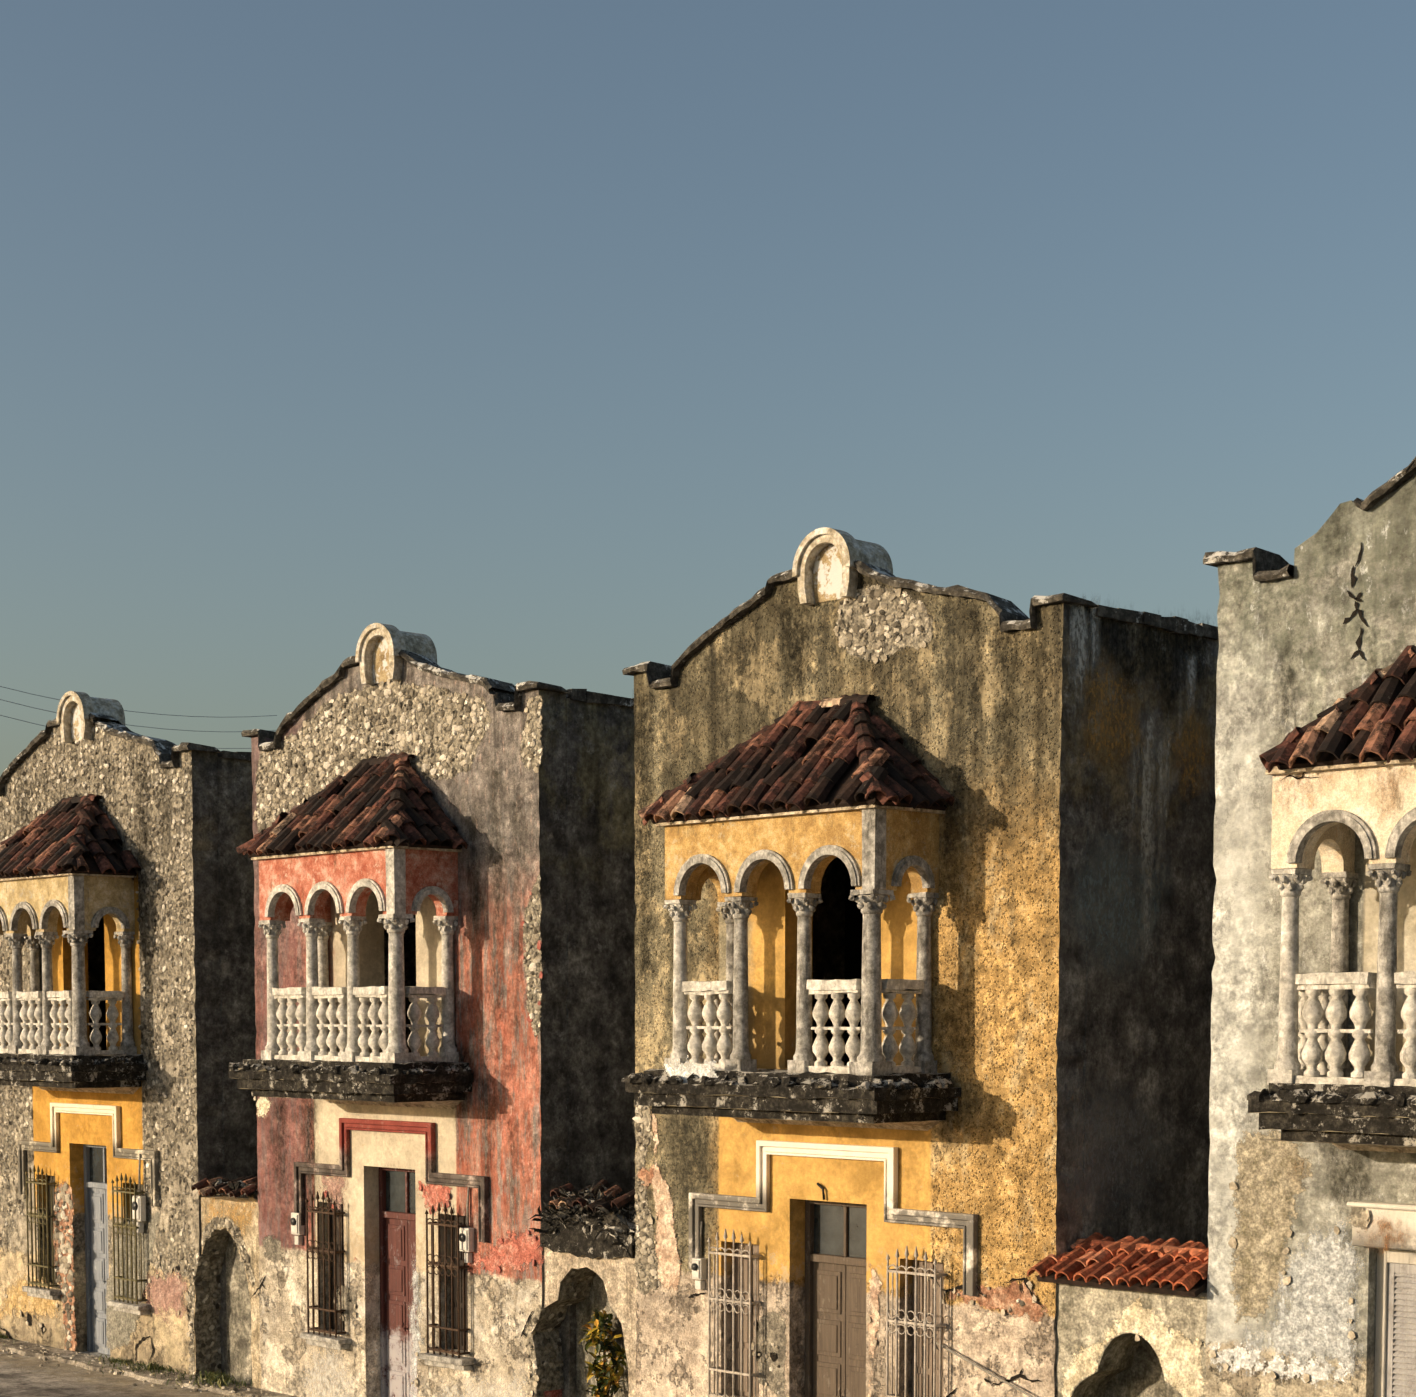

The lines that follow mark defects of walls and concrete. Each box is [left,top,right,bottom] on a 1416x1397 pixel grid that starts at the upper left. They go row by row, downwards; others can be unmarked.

flaking render [833,584,933,664]
crack [1343,542,1368,661]
damp [1070,597,1208,967]
flaking render [521,872,543,1036]
flaking render [0,1180,77,1352]
peeling [466,1225,543,1276]
flaking render [632,1100,682,1294]
flaking render [1059,1129,1371,1397]
crack [946,1368,1041,1397]